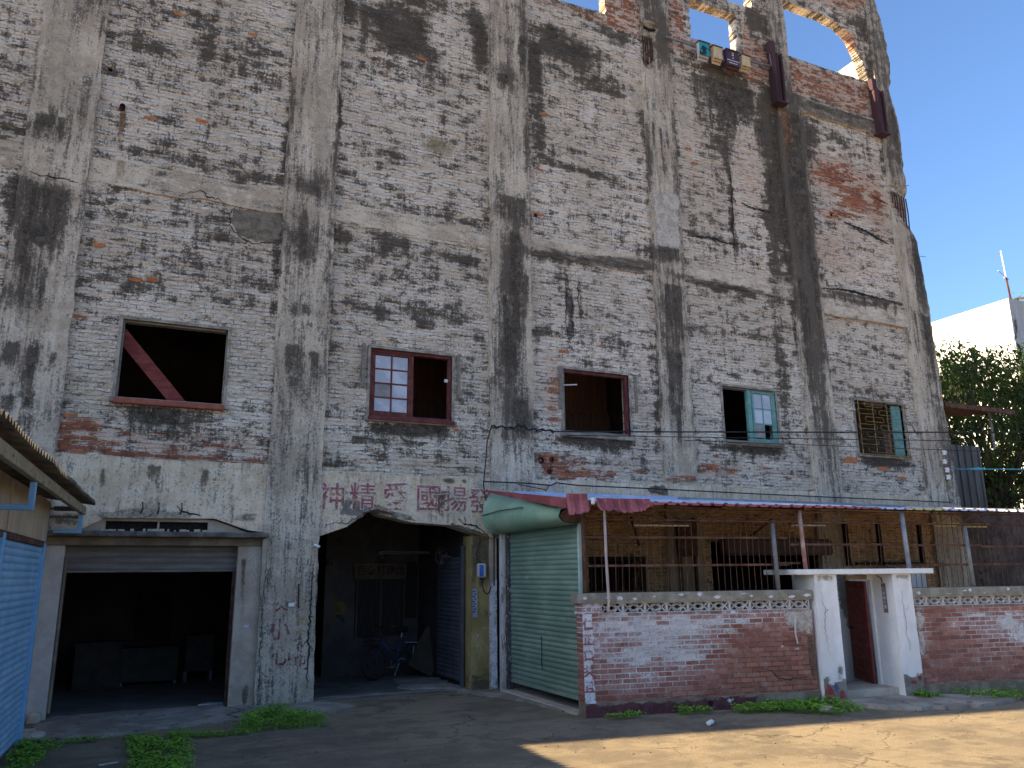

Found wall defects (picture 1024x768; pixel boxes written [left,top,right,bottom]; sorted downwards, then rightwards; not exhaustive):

water stain [14,179,75,309]
crack [187,190,271,244]
water stain [688,72,902,390]
peeling [813,162,911,233]
water stain [912,239,925,297]
water stain [500,232,529,452]
water stain [665,284,684,451]
water stain [913,311,937,386]
peeling [57,413,266,464]
peeling [536,452,615,481]
crack [303,568,314,688]
peeling [582,611,768,719]